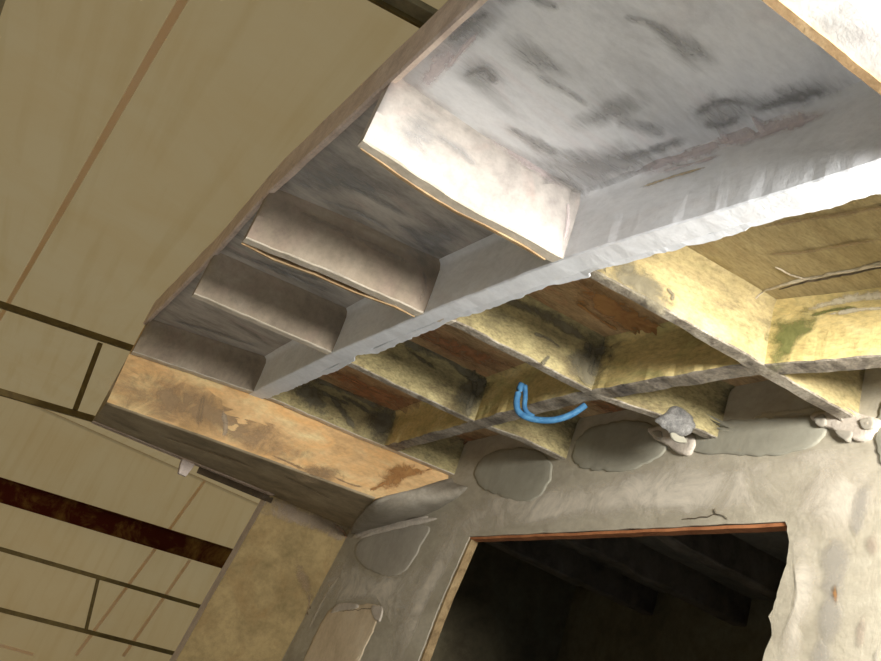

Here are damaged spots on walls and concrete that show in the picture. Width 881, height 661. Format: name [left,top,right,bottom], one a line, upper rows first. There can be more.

water stain [511,128,678,192]
crack [756,261,881,299]
water stain [506,299,612,387]
water stain [770,292,881,363]
water stain [156,385,270,447]
water stain [296,378,394,442]
water stain [404,340,487,416]